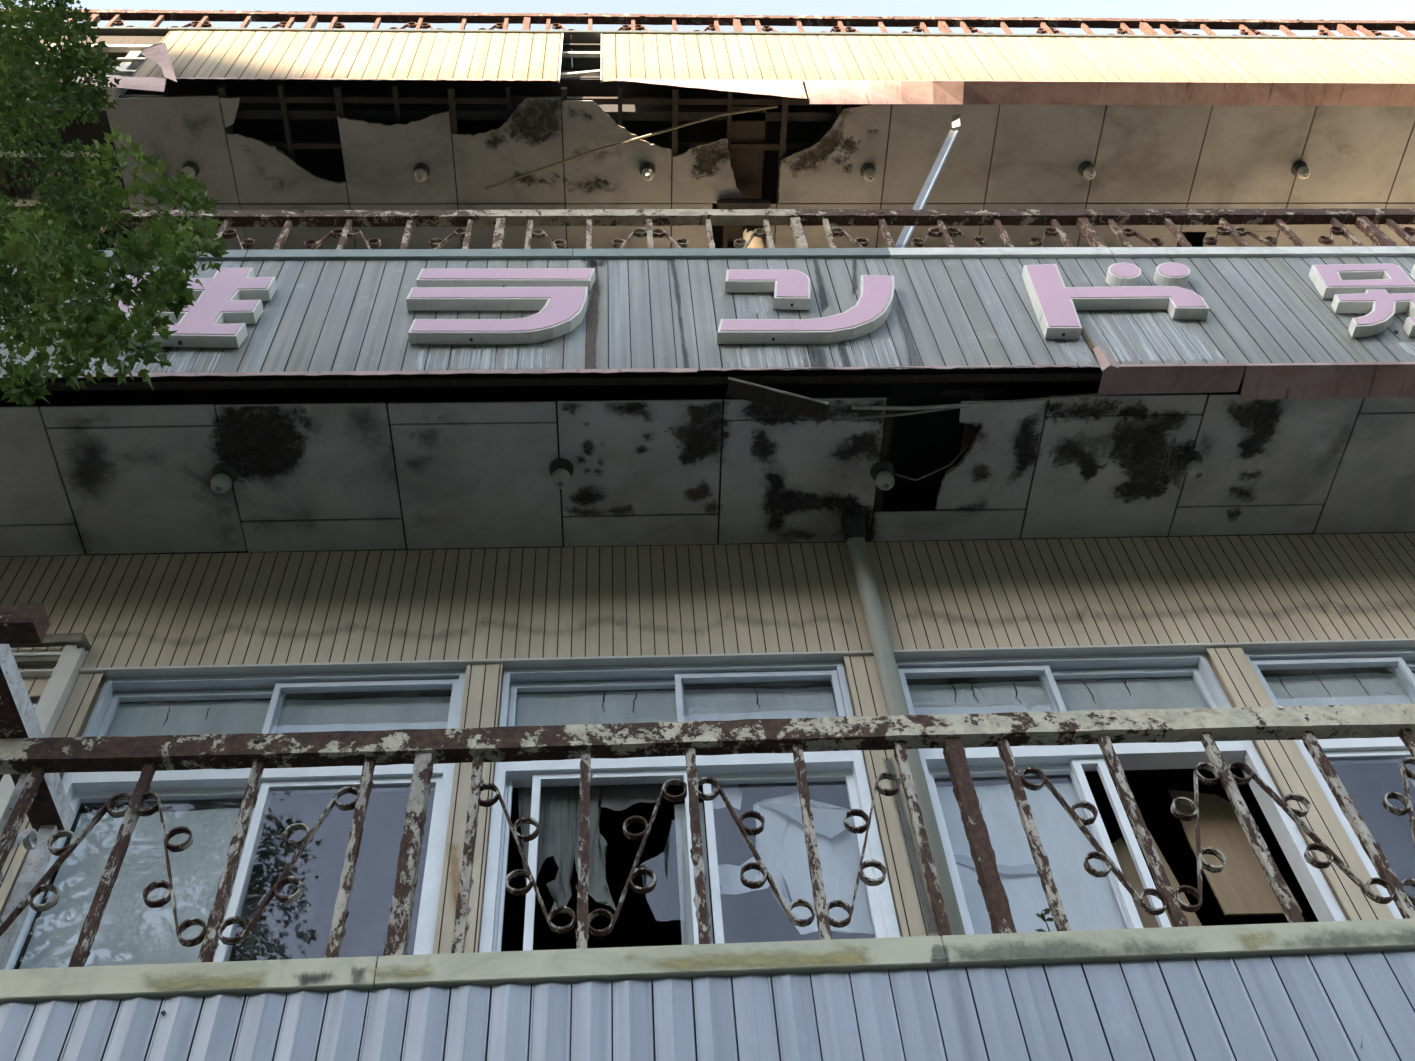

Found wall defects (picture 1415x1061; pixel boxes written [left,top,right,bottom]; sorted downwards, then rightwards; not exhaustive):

water stain [487,99,592,149]
water stain [512,172,616,193]
water stain [691,140,732,178]
water stain [782,111,877,177]
water stain [212,406,317,480]
water stain [572,441,603,505]
water stain [617,402,651,454]
water stain [742,400,886,461]
water stain [1012,401,1195,503]
water stain [1227,399,1282,522]